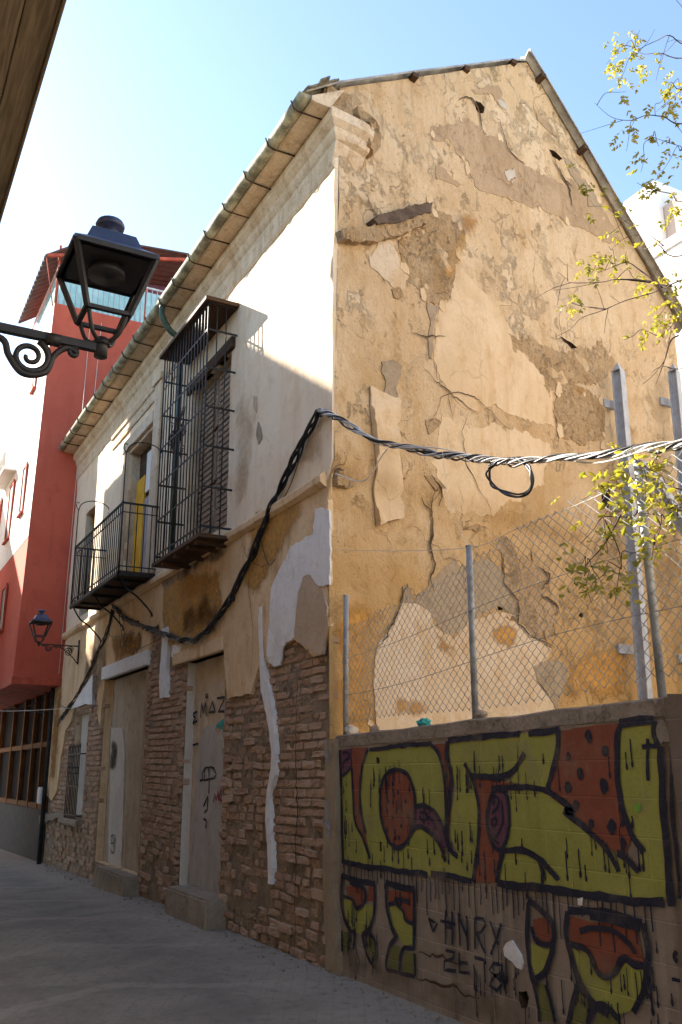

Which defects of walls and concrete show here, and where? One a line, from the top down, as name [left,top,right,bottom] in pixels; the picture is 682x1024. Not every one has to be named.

peeling [430,84,624,249]
flaking render [369,196,467,359]
peeling [381,359,402,397]
flaking render [425,418,442,434]
flaking render [424,475,446,491]
crack [411,332,559,648]
flaking render [508,333,615,450]
damp [162,548,222,644]
peeling [367,523,568,730]
flaking render [45,689,110,880]
flaking render [137,629,193,904]
flaking render [217,575,339,967]